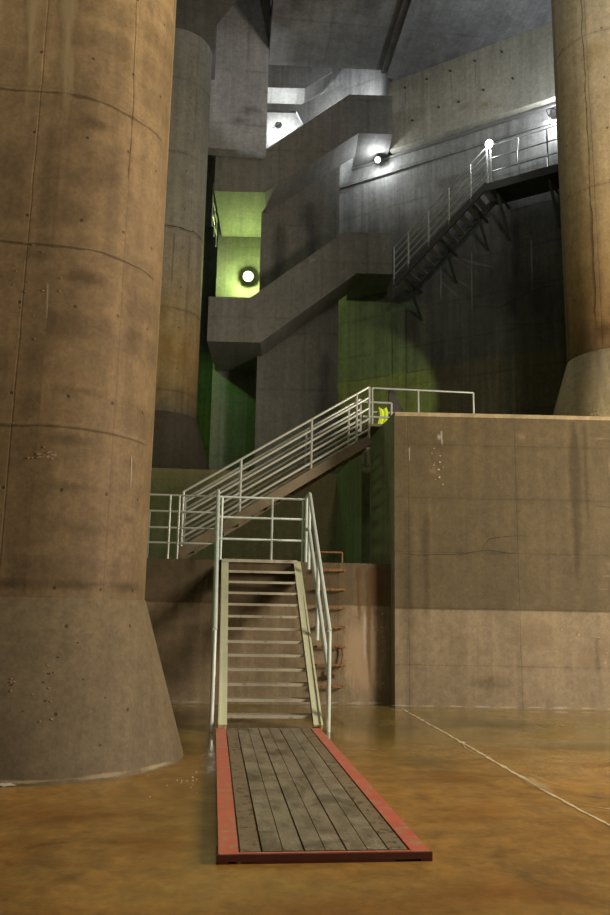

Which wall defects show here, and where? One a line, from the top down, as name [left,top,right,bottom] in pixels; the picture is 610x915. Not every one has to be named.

crack [401,708,610,826]